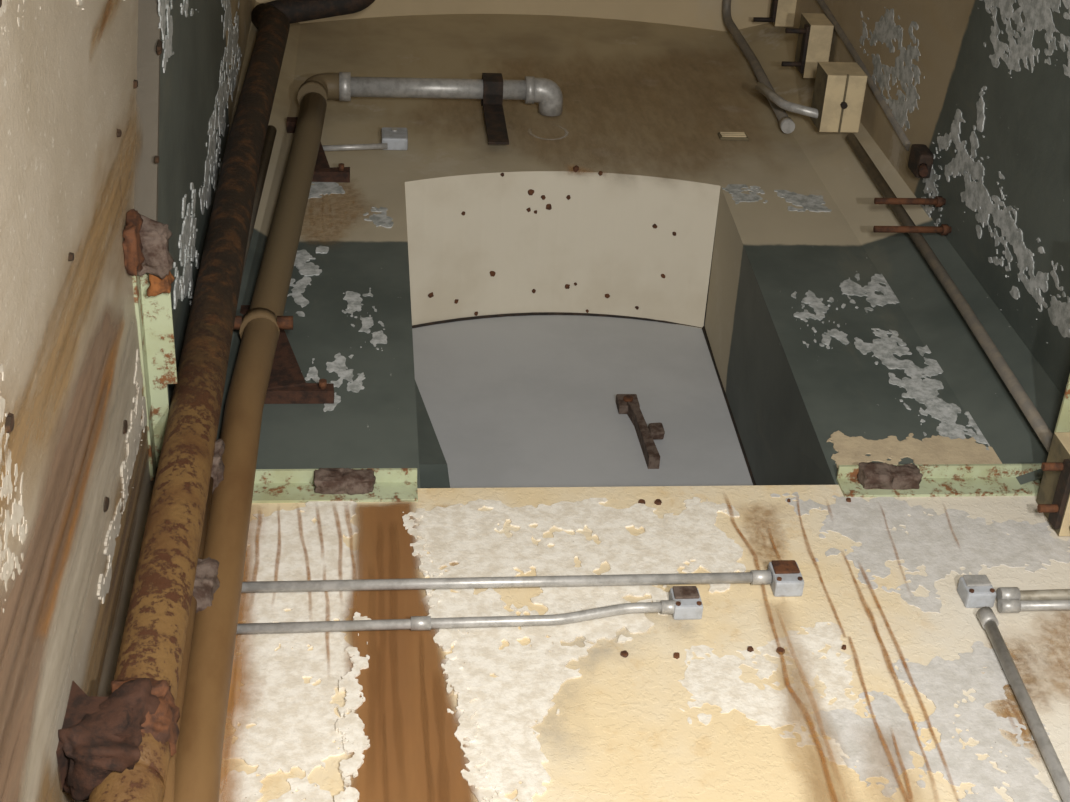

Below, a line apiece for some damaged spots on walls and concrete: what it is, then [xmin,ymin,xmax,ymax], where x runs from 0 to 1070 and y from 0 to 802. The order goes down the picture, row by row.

peeling [173,0,242,309]
peeling [920,86,1070,338]
peeling [978,0,1070,78]
peeling [301,288,387,412]
peeling [791,273,1002,468]
water stain [23,322,141,802]
peeling [219,501,371,802]
rust [337,502,473,802]
peeling [402,497,746,802]
peeling [678,622,1063,802]
peeling [770,492,1070,613]
water stain [997,684,1034,745]